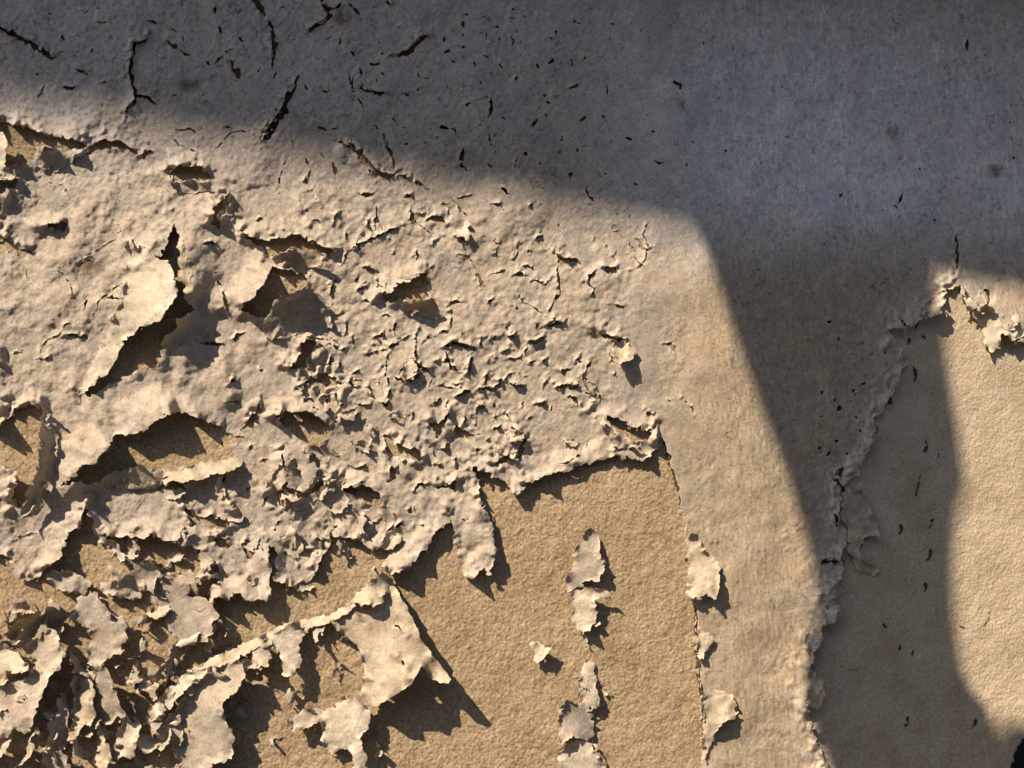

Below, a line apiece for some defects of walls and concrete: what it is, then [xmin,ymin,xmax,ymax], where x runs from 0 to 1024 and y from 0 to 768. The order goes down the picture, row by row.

crack [304,0,362,33]
crack [0,20,241,117]
crack [224,0,299,140]
peeling [0,122,153,196]
peeling [170,165,212,194]
crack [304,126,428,189]
peeling [0,192,738,768]
peeling [804,286,1024,768]